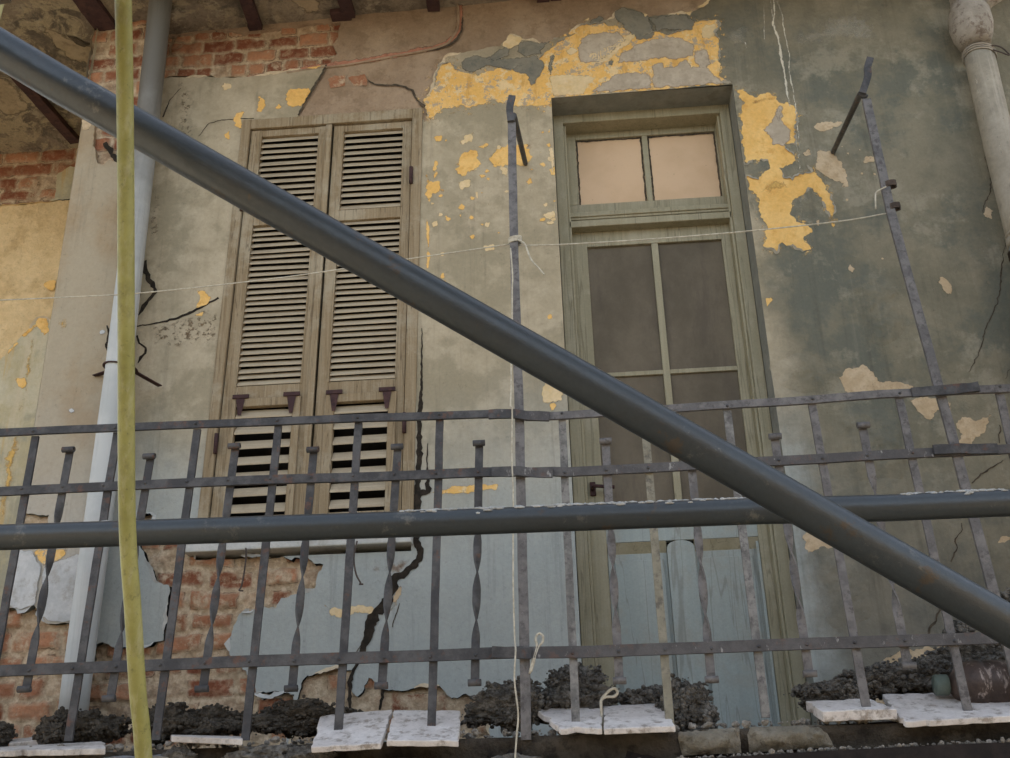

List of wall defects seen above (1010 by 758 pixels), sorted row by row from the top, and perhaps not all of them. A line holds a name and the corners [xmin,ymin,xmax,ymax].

peeling [418,0,876,268]
damp [763,0,799,158]
crack [136,260,219,363]
crack [969,242,1006,372]
crack [414,328,432,510]
peeling [541,383,563,411]
peeling [839,365,951,420]
peeling [956,415,991,444]
crack [972,425,1003,483]
flaking render [0,549,79,746]
flaking render [142,545,323,714]
crack [347,537,424,710]